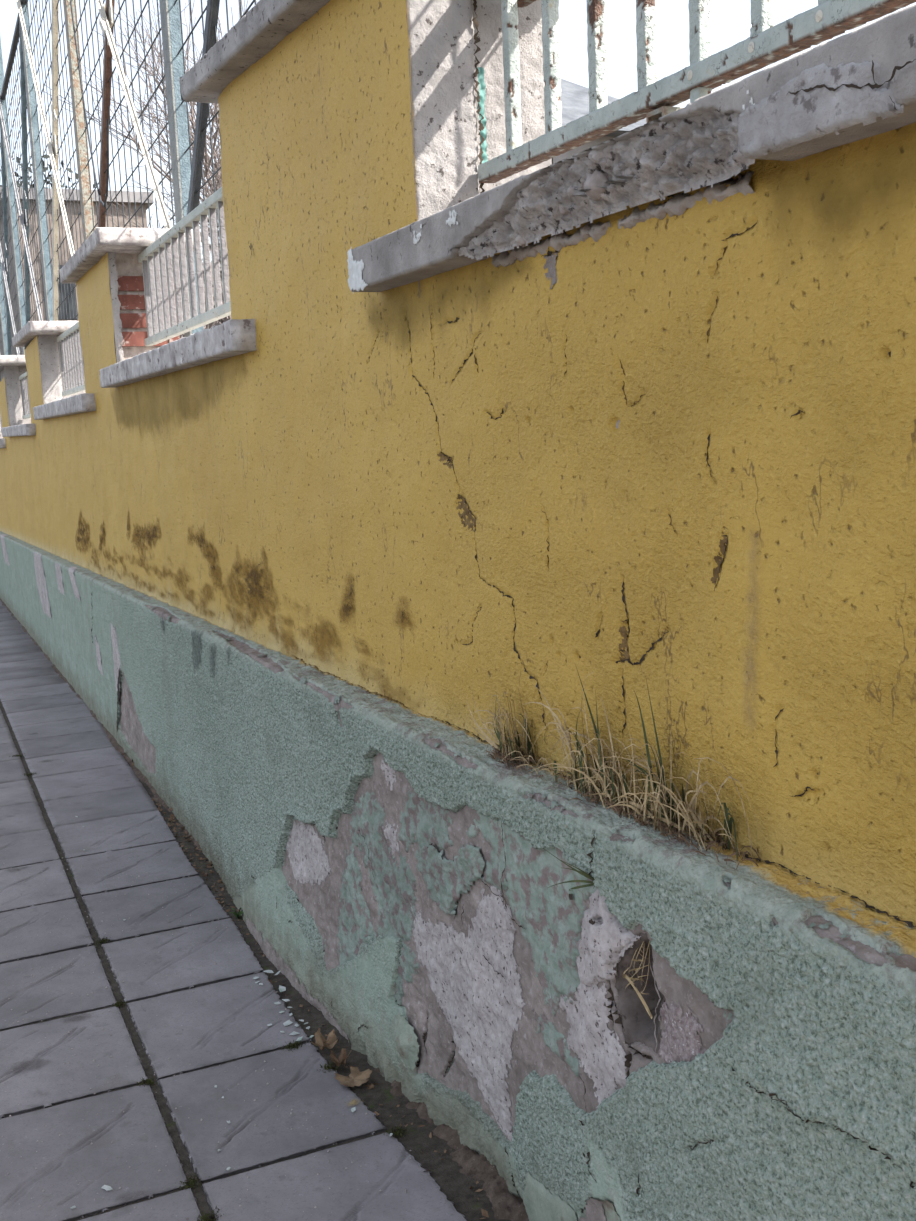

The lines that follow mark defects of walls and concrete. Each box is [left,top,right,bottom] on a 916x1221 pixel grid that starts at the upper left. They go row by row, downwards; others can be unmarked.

crack [787,59,915,110]
spalling [458,90,755,289]
crack [406,311,481,490]
peeling [94,624,156,773]
water stain [191,631,229,671]
water stain [75,512,353,657]
crack [295,656,500,747]
crack [462,531,573,779]
crack [595,579,667,733]
peeling [246,916,350,1043]
peeling [282,752,734,1143]
crack [685,826,916,927]